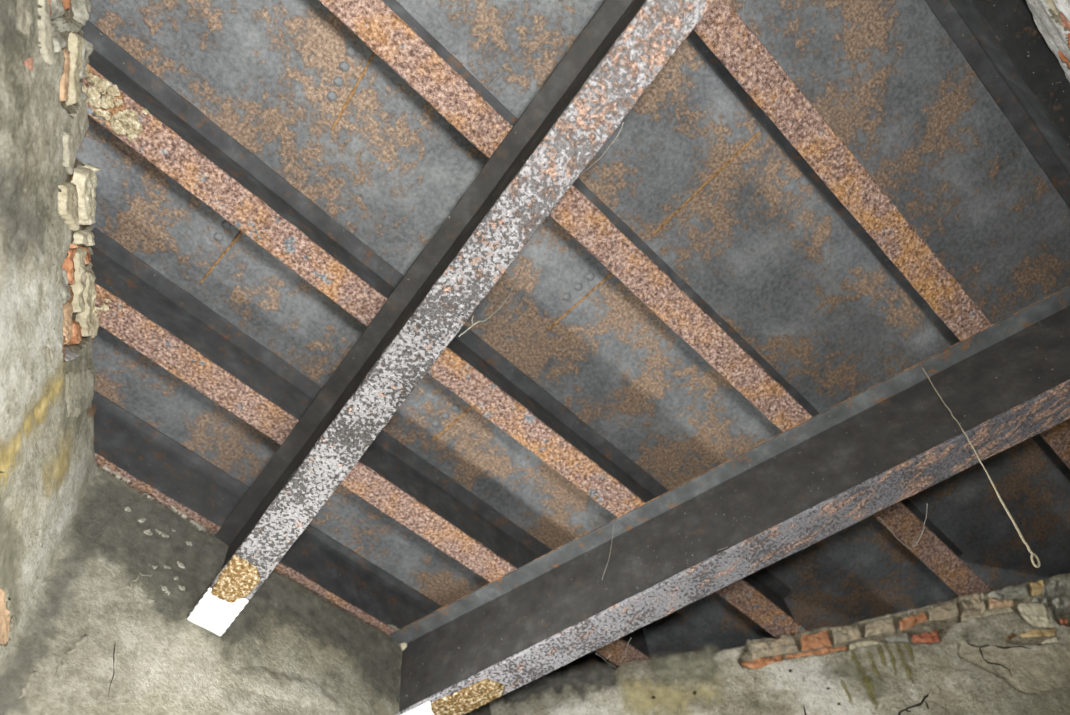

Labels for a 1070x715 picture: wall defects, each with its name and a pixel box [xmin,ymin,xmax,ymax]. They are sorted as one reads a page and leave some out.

spalling [16,0,94,119]
flaking render [1045,0,1070,70]
flaking render [43,132,101,366]
water stain [0,362,94,485]
water stain [0,499,20,611]
flaking render [737,577,1070,695]
crack [965,640,1030,677]